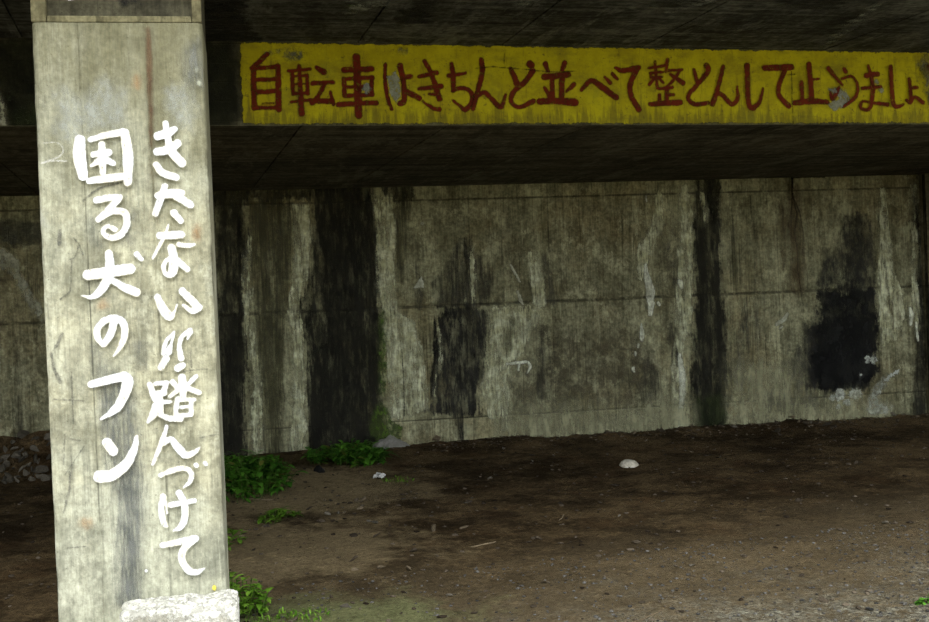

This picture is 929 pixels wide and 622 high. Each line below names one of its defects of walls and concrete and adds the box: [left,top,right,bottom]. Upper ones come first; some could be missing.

peeling [386,72,401,101]
water stain [213,174,929,457]